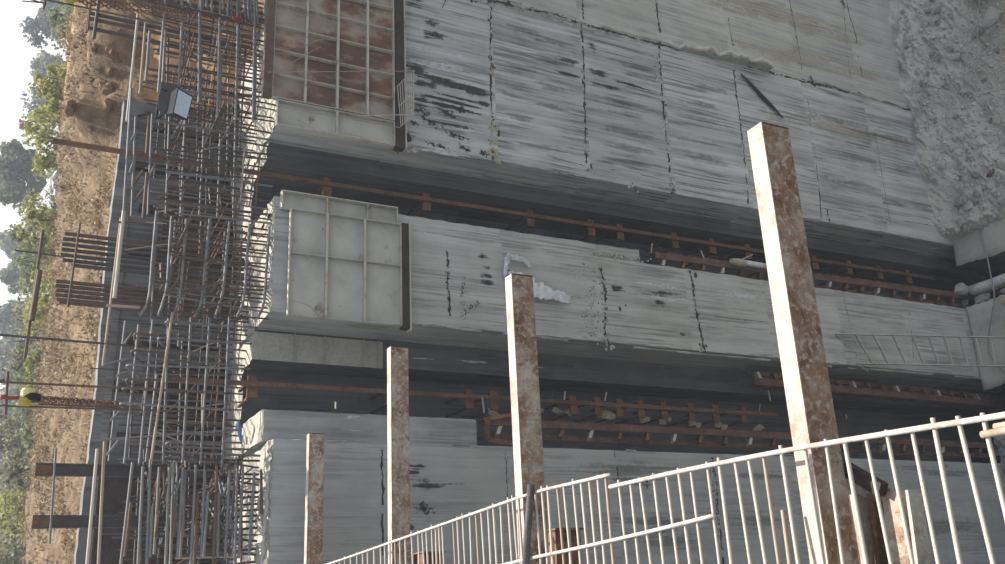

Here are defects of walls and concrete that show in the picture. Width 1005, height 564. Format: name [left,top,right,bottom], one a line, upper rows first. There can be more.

spalling [661,40,775,68]
crack [474,0,911,219]
crack [688,270,763,353]